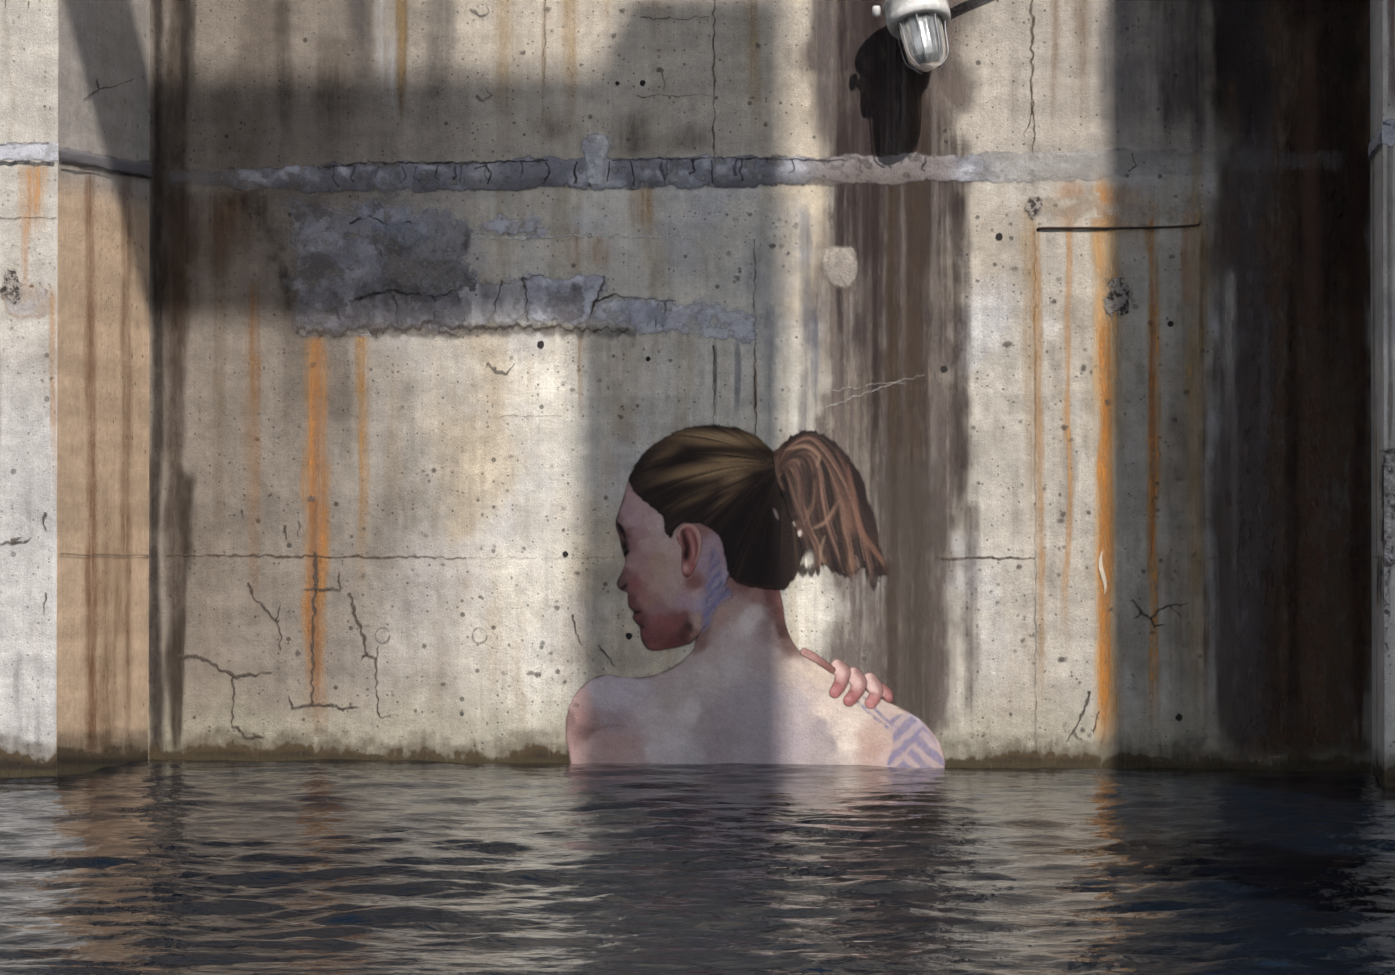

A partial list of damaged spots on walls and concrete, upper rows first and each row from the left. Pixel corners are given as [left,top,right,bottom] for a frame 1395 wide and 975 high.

water stain [805,0,971,158]
crack [178,522,391,739]
water stain [800,178,975,734]
corrosion [1093,188,1118,722]
corrosion [1148,207,1159,684]
crack [1131,599,1188,628]
water stain [1159,0,1371,754]
spalling [1377,448,1395,651]